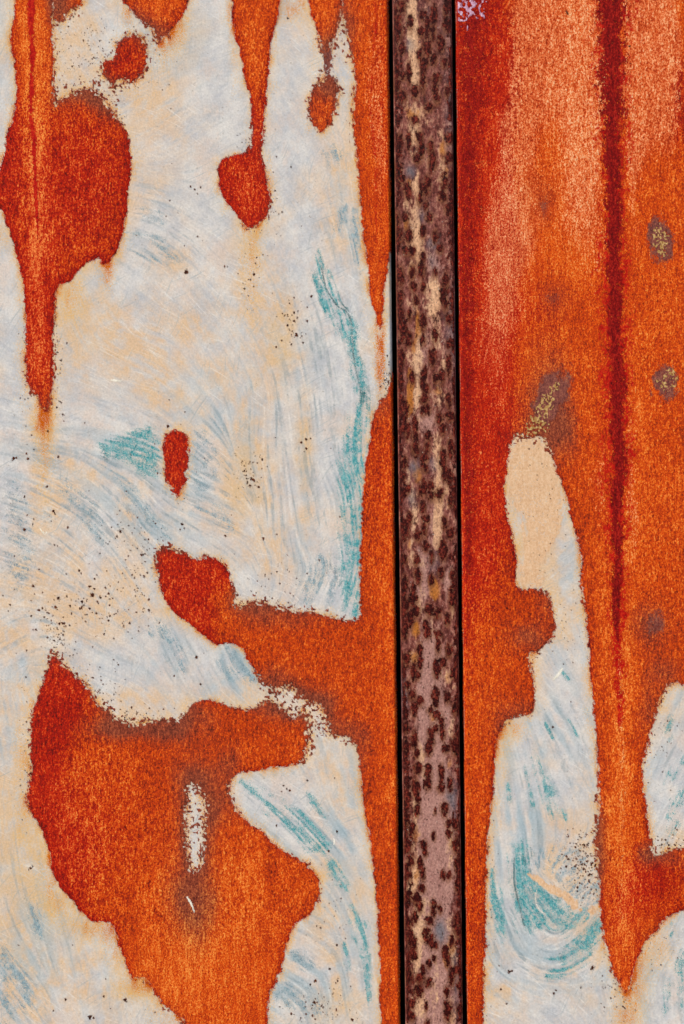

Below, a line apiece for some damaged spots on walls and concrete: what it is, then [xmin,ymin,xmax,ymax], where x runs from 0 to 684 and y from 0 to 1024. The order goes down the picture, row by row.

rust [416,176,433,238]
rust [0,0,196,531]
rust [417,313,427,347]
rust [154,411,205,502]
rust [422,619,442,653]